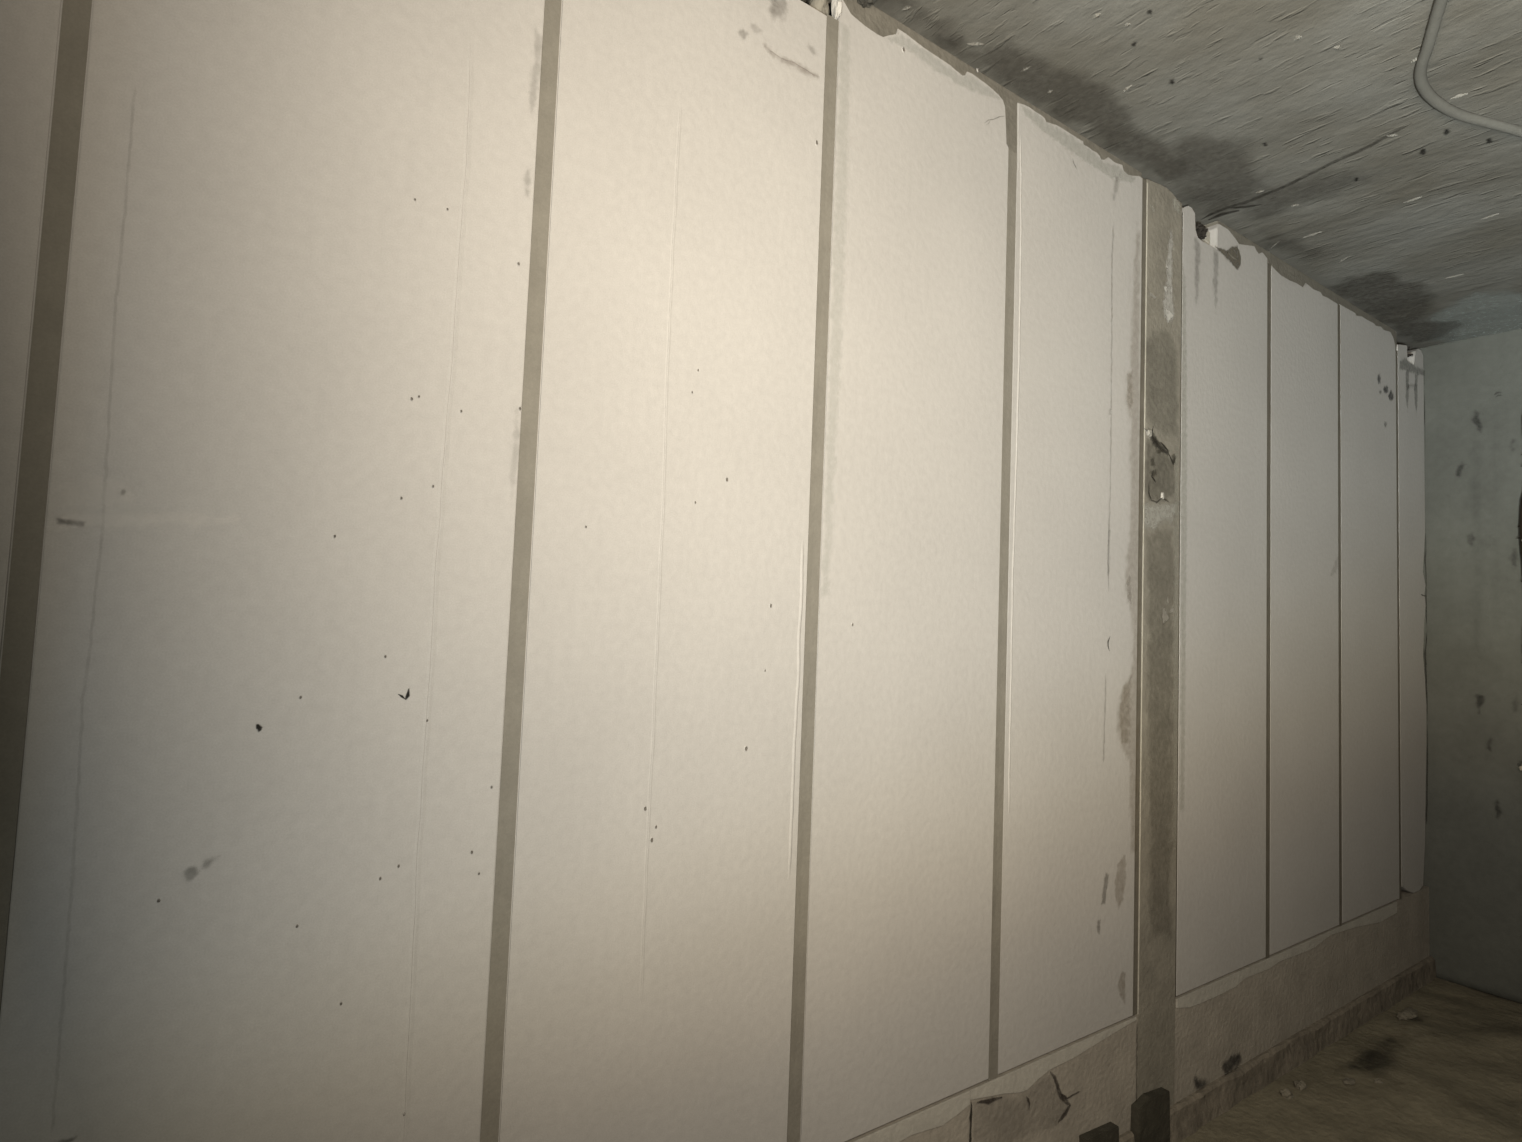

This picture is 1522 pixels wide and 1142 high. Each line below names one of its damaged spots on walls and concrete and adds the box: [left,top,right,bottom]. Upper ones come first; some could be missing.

leakage [1163,233,1174,322]
crack [966,1102,974,1142]